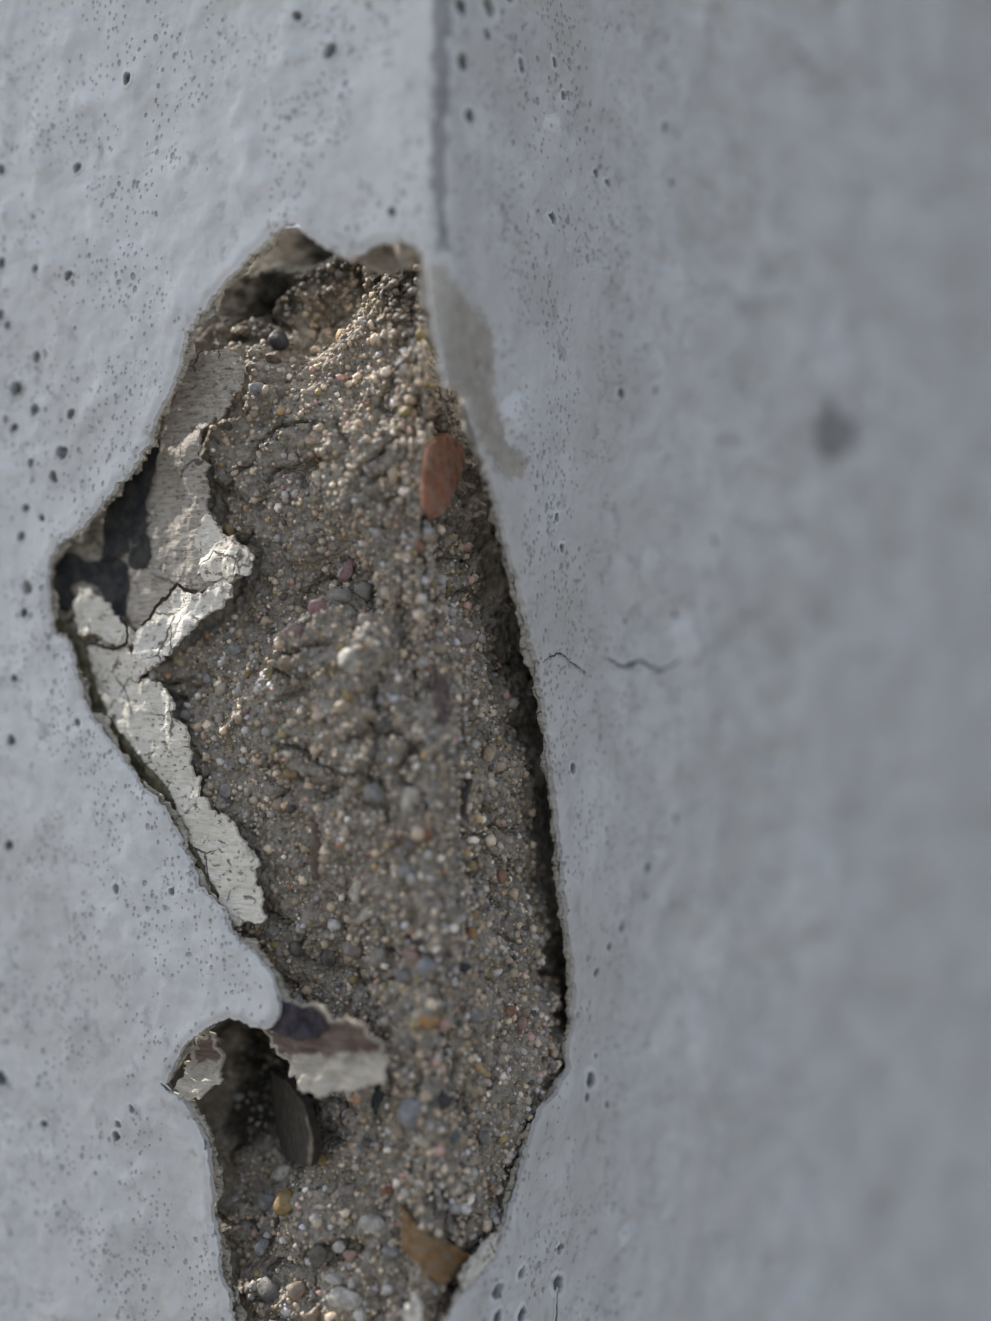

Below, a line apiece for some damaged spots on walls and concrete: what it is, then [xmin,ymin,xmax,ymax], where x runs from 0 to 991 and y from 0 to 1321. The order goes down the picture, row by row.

spalling [26,442,72,488]
crack [85,582,207,651]
spalling [57,226,568,1321]
spalling [583,1050,610,1112]